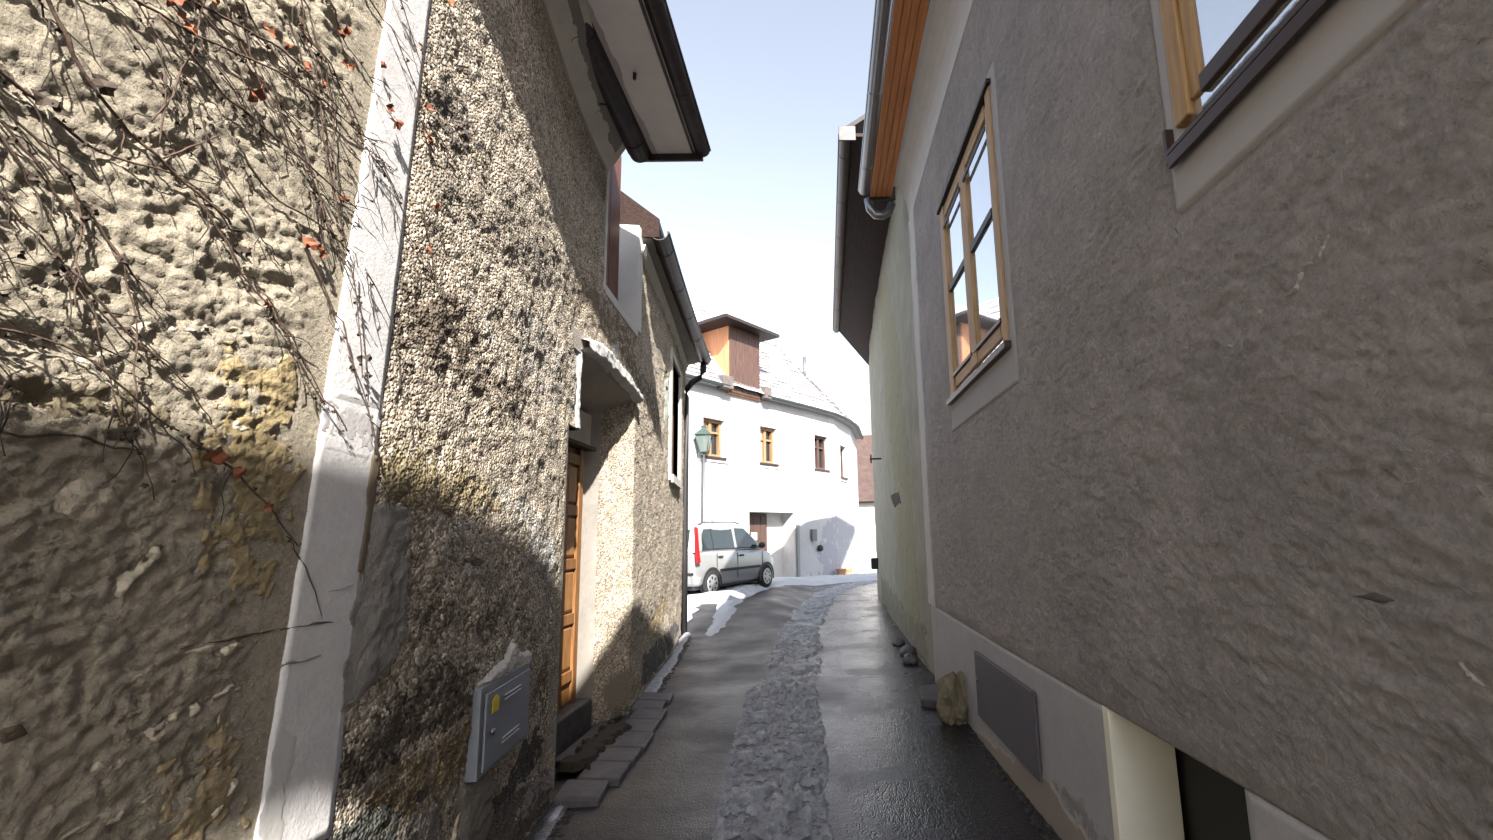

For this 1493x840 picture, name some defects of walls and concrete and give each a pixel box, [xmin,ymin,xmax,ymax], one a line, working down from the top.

spalling [334,394,567,840]